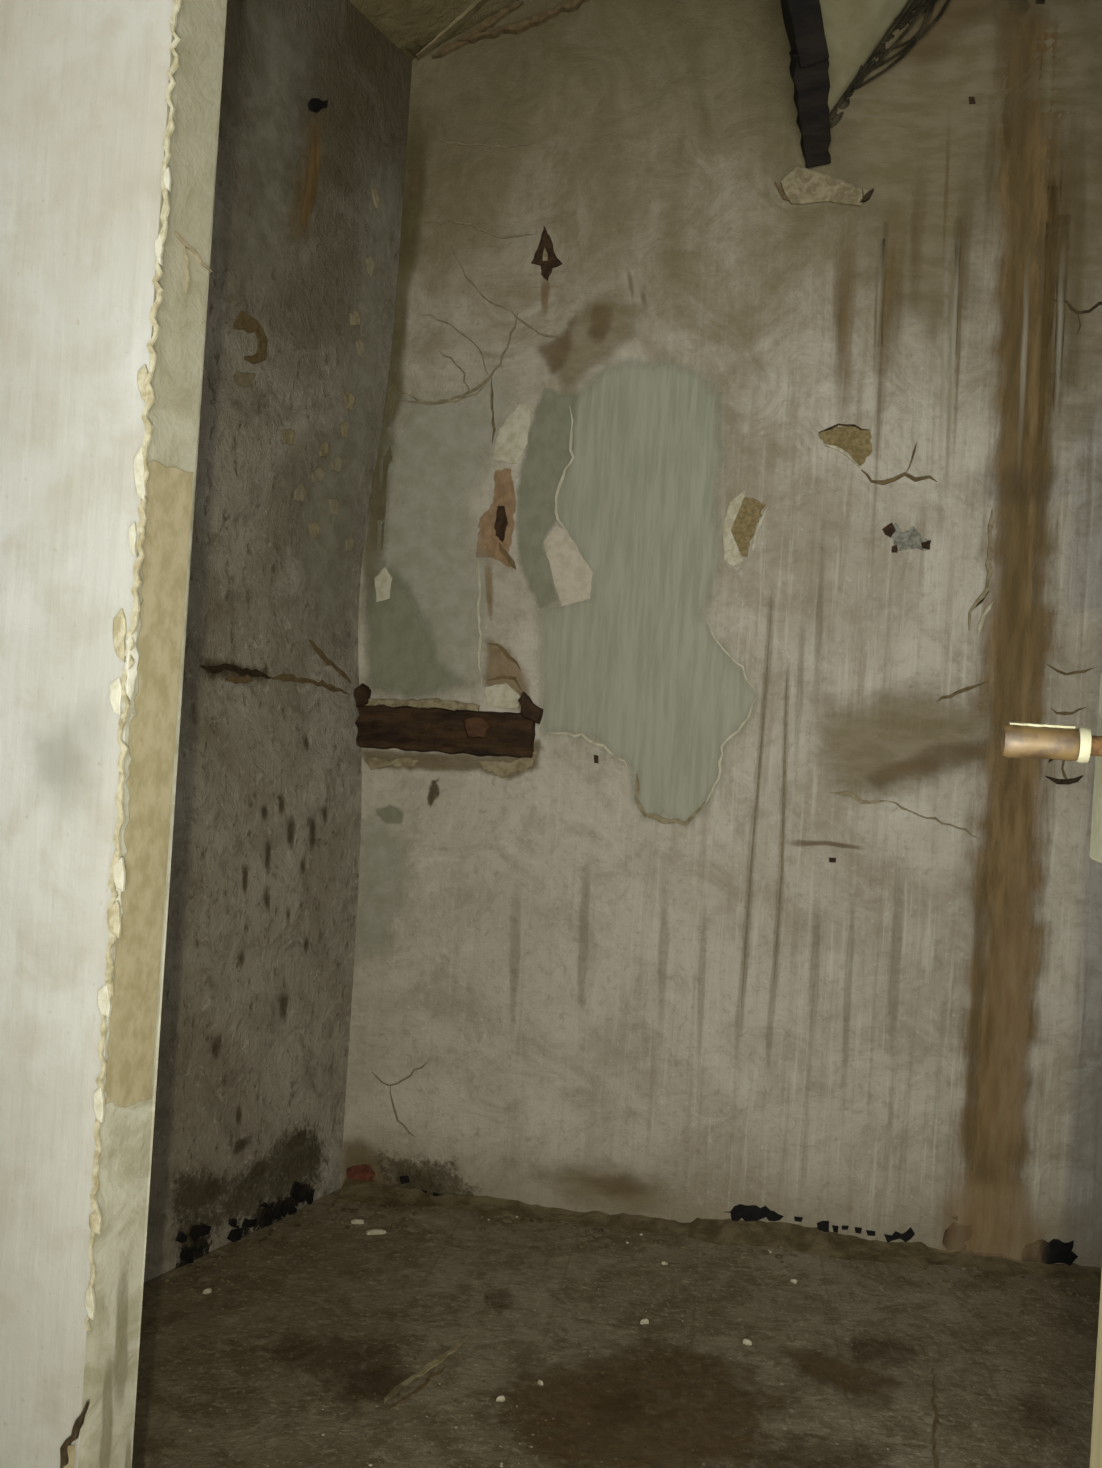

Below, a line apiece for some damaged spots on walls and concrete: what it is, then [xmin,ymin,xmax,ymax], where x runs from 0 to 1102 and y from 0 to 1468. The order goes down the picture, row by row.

spalling [818,423,872,468]
peeling [363,363,768,826]
crack [200,639,351,695]
peeling [355,806,403,952]
water stain [174,1126,326,1269]
crack [60,1401,90,1468]
water stain [100,1286,130,1468]